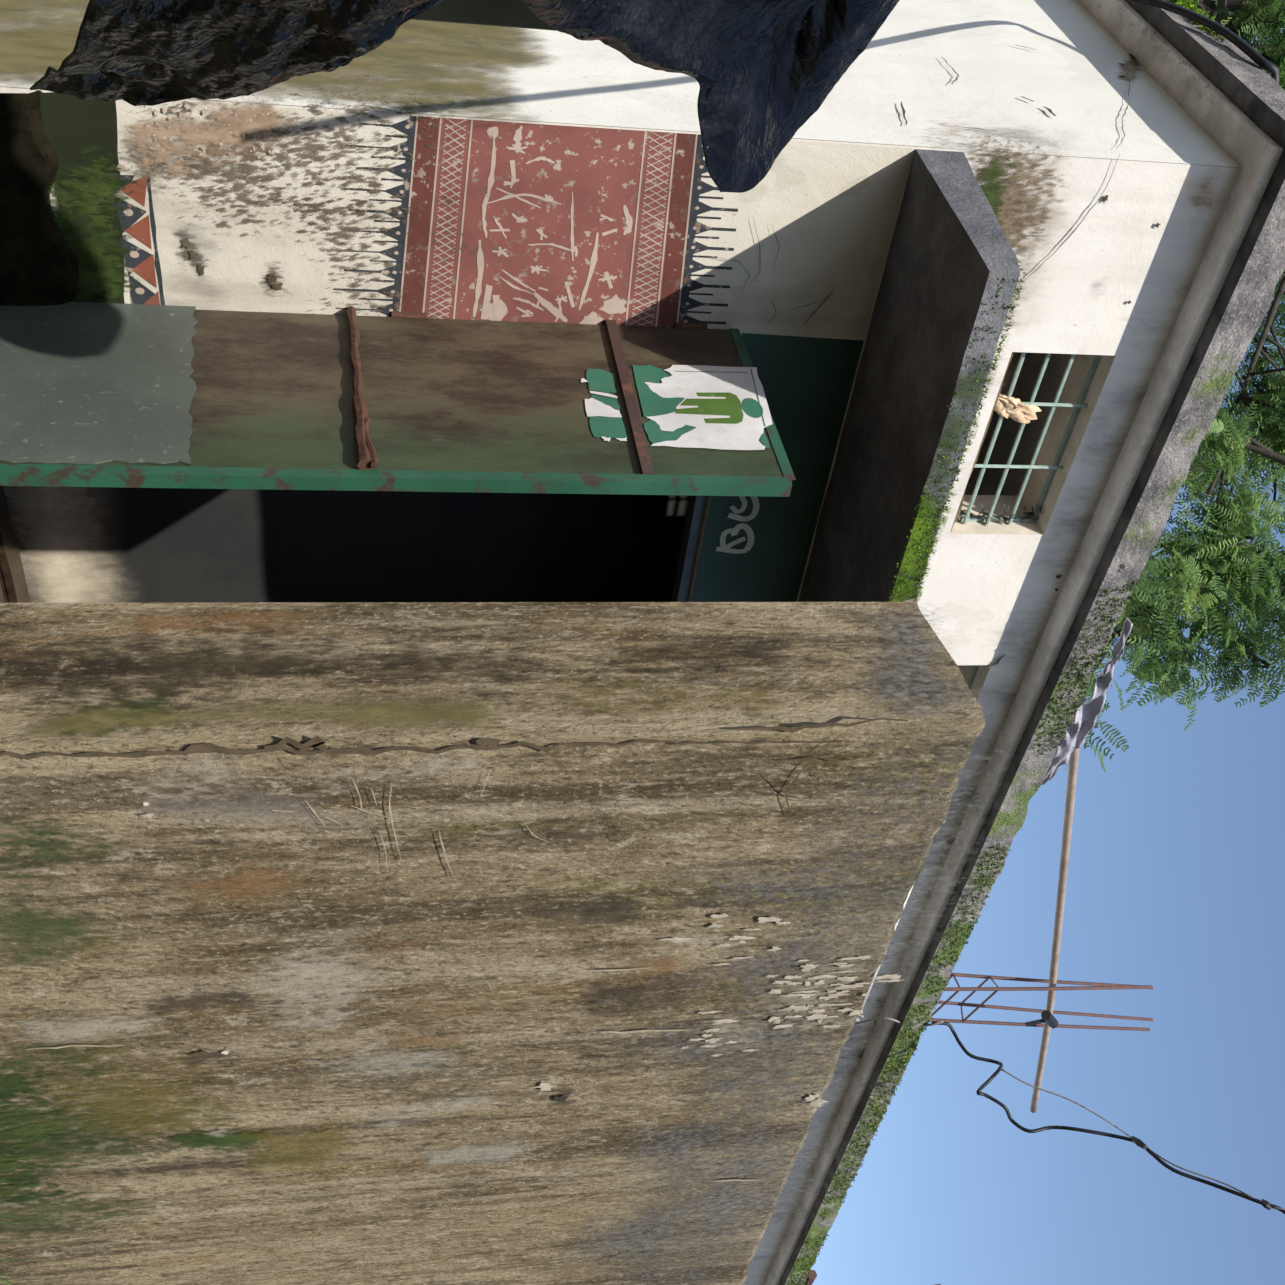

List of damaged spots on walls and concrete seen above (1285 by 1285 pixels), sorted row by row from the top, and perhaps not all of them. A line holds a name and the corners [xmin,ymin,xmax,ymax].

damp [122,72,441,316]
damp [963,136,1063,261]
crack [1017,79,1130,288]
crack [0,717,908,817]
peeling [709,913,790,966]
peeling [680,1011,760,1057]
peeling [763,956,901,1029]